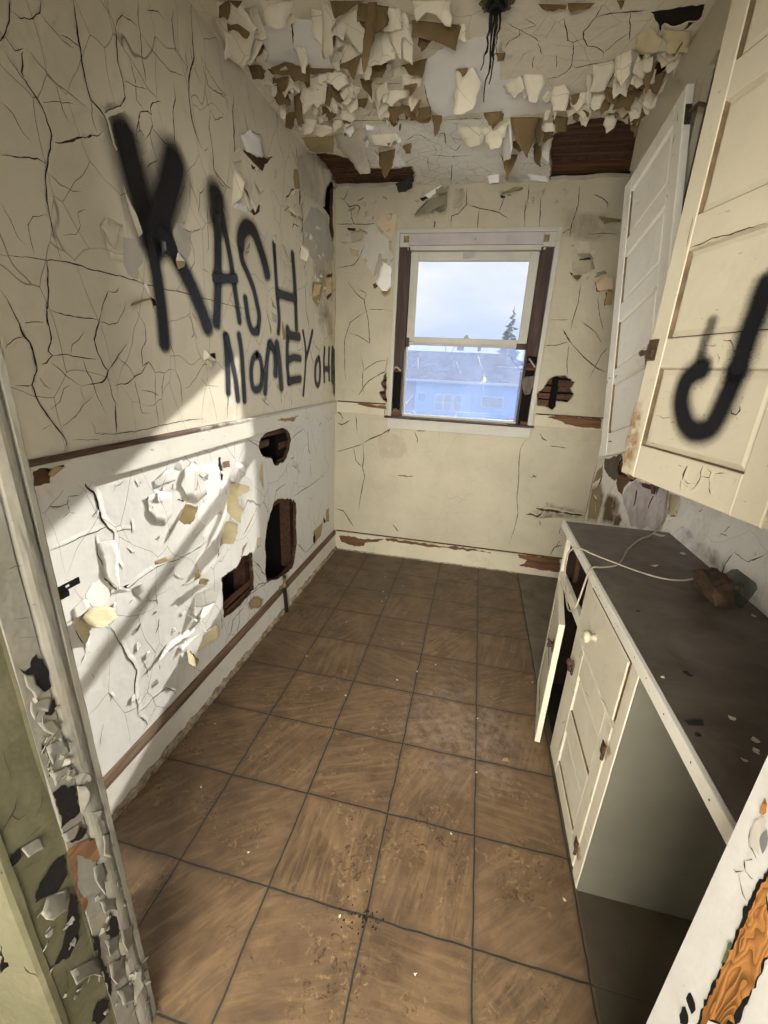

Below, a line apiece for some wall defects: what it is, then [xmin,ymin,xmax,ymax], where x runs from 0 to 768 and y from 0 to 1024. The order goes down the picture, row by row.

crack [505,4,645,85]
peeling [200,0,705,307]
crack [0,0,278,452]
crack [546,284,617,403]
peeling [73,415,299,670]
peeling [339,535,491,554]
crack [511,433,565,537]
peeling [518,554,561,572]
flaking render [528,374,602,429]
corrosion [624,412,640,481]
flaking render [593,454,680,537]
peeling [19,654,158,1024]